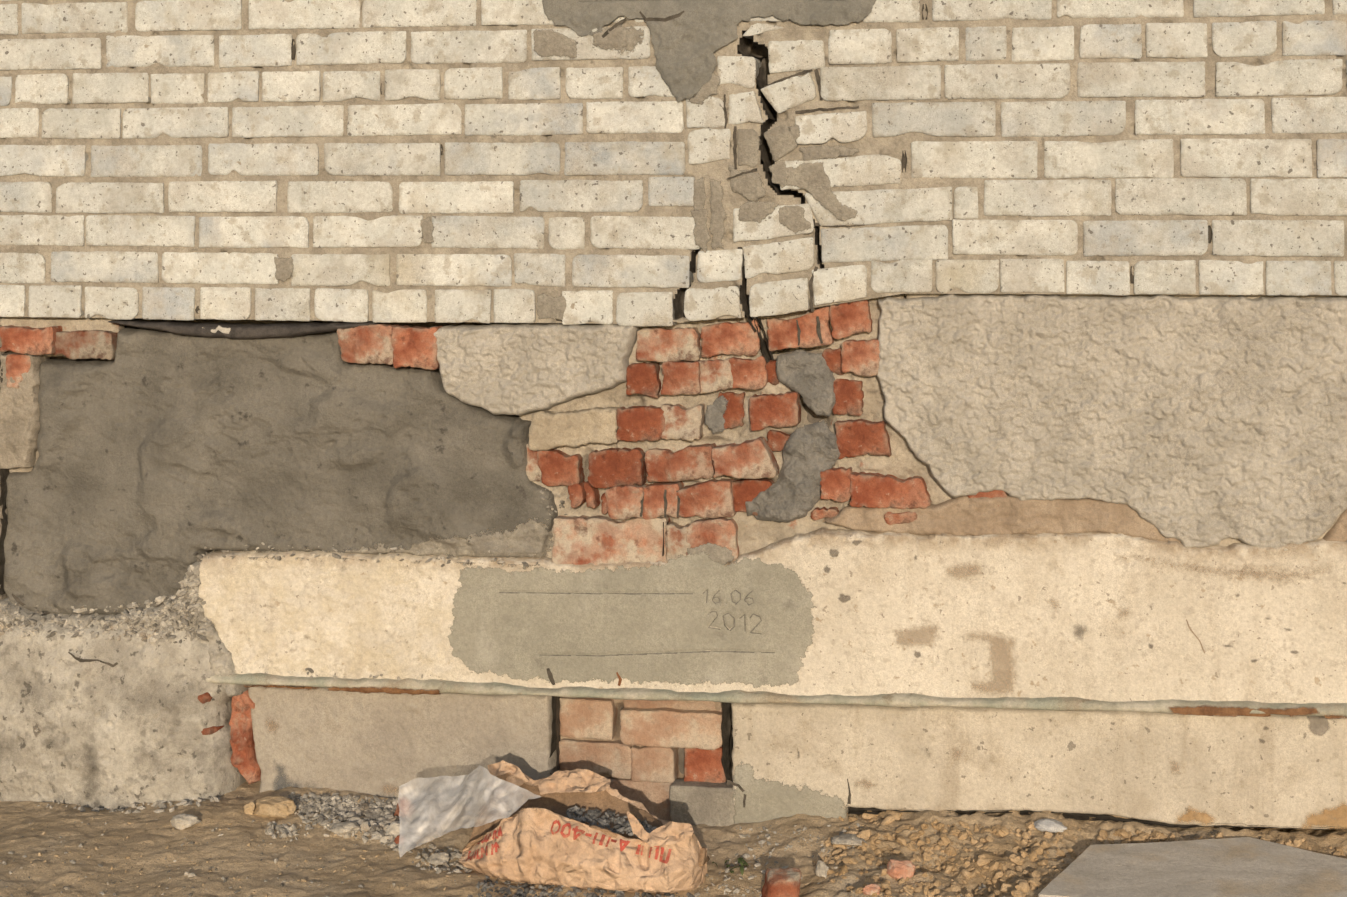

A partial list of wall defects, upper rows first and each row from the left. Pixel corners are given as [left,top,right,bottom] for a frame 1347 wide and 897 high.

crack [673,248,701,319]
crack [723,31,865,362]